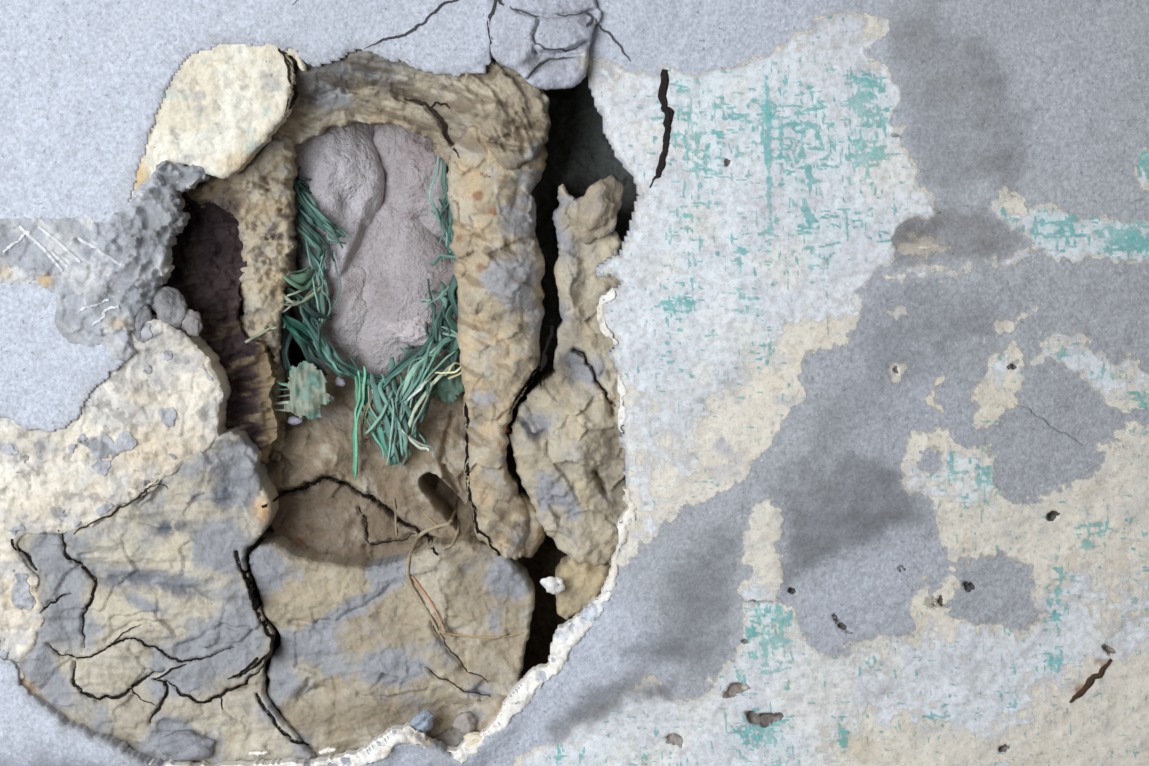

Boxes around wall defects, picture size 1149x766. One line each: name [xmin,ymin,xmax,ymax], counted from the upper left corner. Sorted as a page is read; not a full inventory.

crack [364,0,458,49]
crack [487,0,630,79]
crack [649,69,674,188]
peeling [588,11,937,567]
peeling [897,231,951,261]
peeling [883,261,973,285]
peeling [984,186,1149,268]
spalling [0,42,639,766]
crack [262,476,438,555]
crack [464,403,500,556]
peeling [491,305,1149,766]
crack [40,479,309,745]